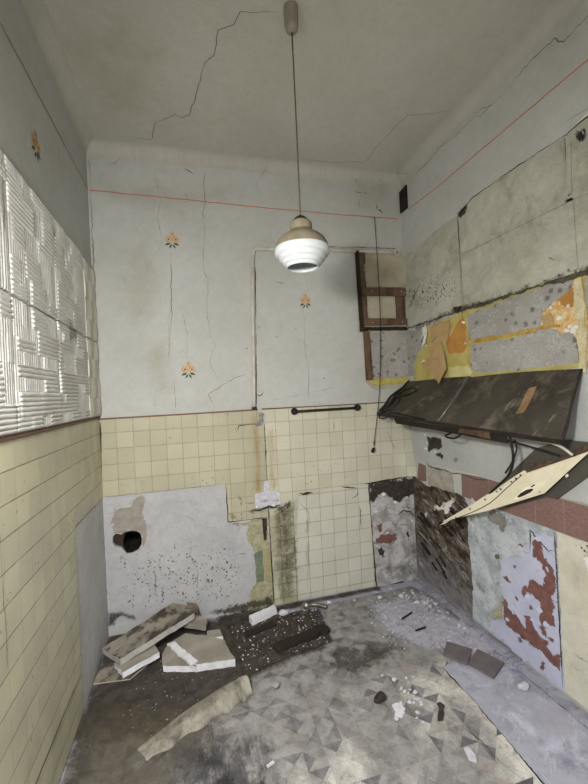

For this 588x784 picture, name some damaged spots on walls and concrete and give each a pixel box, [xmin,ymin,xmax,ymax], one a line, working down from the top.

crack [130,11,284,140]
crack [399,18,586,174]
crack [168,270,188,356]
crack [185,169,243,406]
peeling [413,314,474,384]
peeling [540,277,588,373]
spalling [111,495,147,553]
damp [66,503,380,784]
peeling [233,518,274,611]
spalling [368,477,414,513]
spalling [425,465,455,517]
peeling [503,536,561,672]